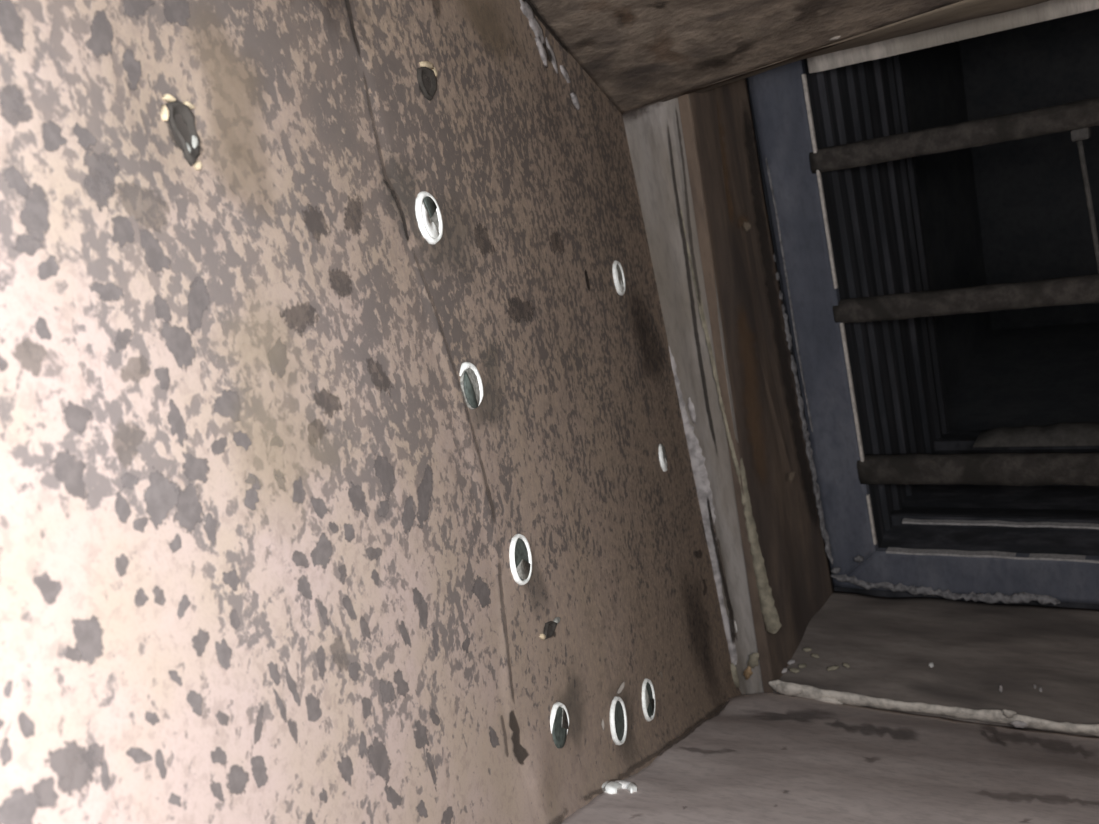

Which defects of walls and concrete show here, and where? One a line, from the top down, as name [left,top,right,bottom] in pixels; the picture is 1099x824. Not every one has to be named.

damp [0,84,171,280]
crack [345,0,495,518]
damp [0,317,52,376]
damp [113,277,252,553]
damp [274,469,371,640]
damp [0,740,110,824]
damp [65,615,104,665]
damp [192,629,232,670]
damp [210,706,268,802]
damp [267,662,322,744]
damp [337,669,409,809]
crack [498,563,514,700]